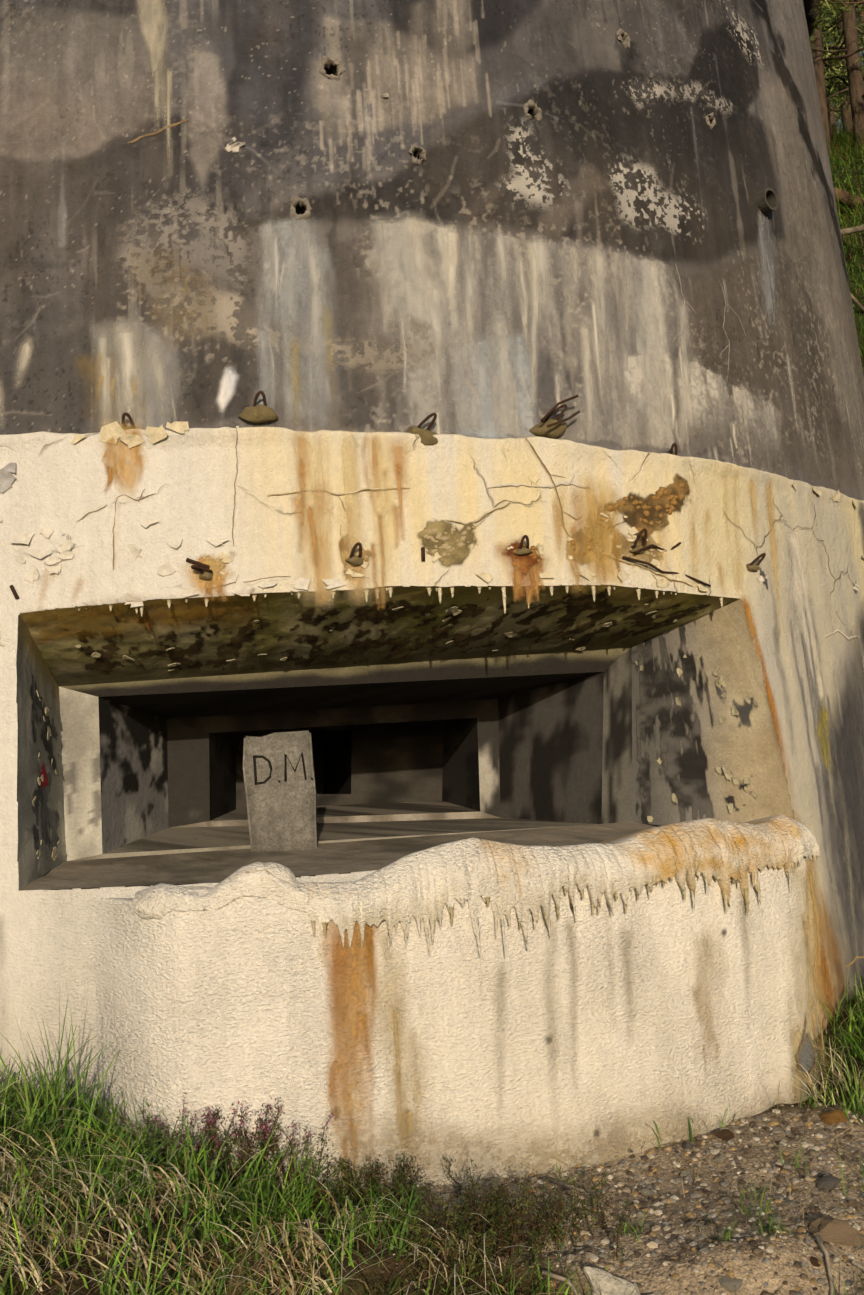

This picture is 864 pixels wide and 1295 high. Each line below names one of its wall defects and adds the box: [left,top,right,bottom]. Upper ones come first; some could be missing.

leakage [99,324,177,430]
leakage [120,197,560,438]
leakage [581,254,778,459]
rust [295,446,331,594]
rust [343,445,402,589]
peeling [64,474,759,824]
rust [743,600,781,742]
crack [825,630,861,641]
leakage [791,536,864,995]
leakage [132,815,820,958]
rust [337,922,388,1064]
rust [806,870,836,1061]